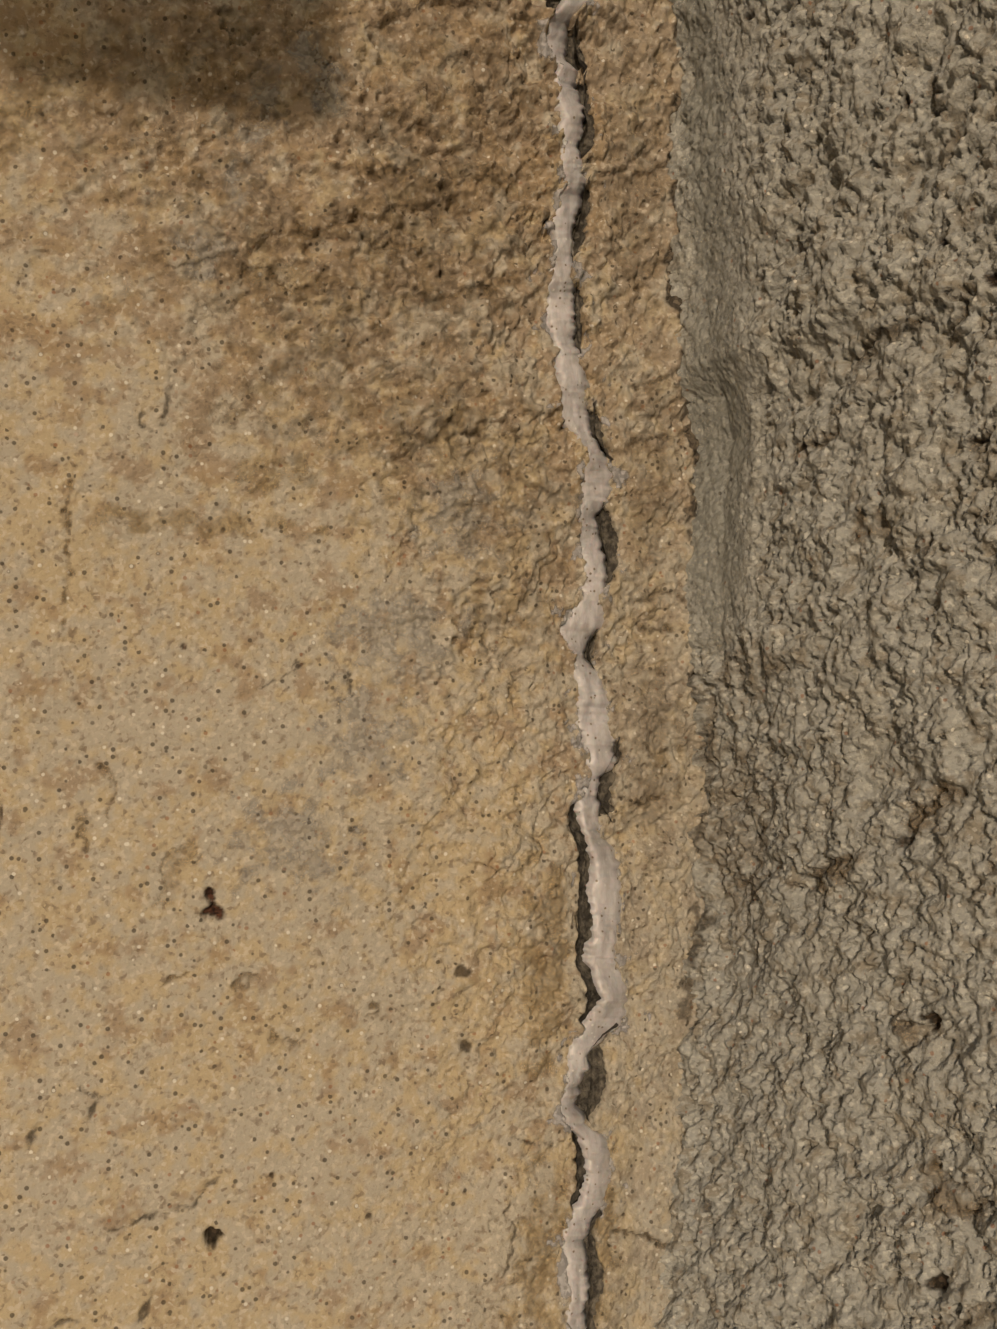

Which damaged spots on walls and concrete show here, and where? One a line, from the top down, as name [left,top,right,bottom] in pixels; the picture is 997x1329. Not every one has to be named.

crack [546,0,595,354]
crack [669,93,682,212]
crack [587,248,700,538]
crack [595,502,619,587]
crack [565,624,599,669]
crack [637,590,684,633]
crack [565,736,667,1329]